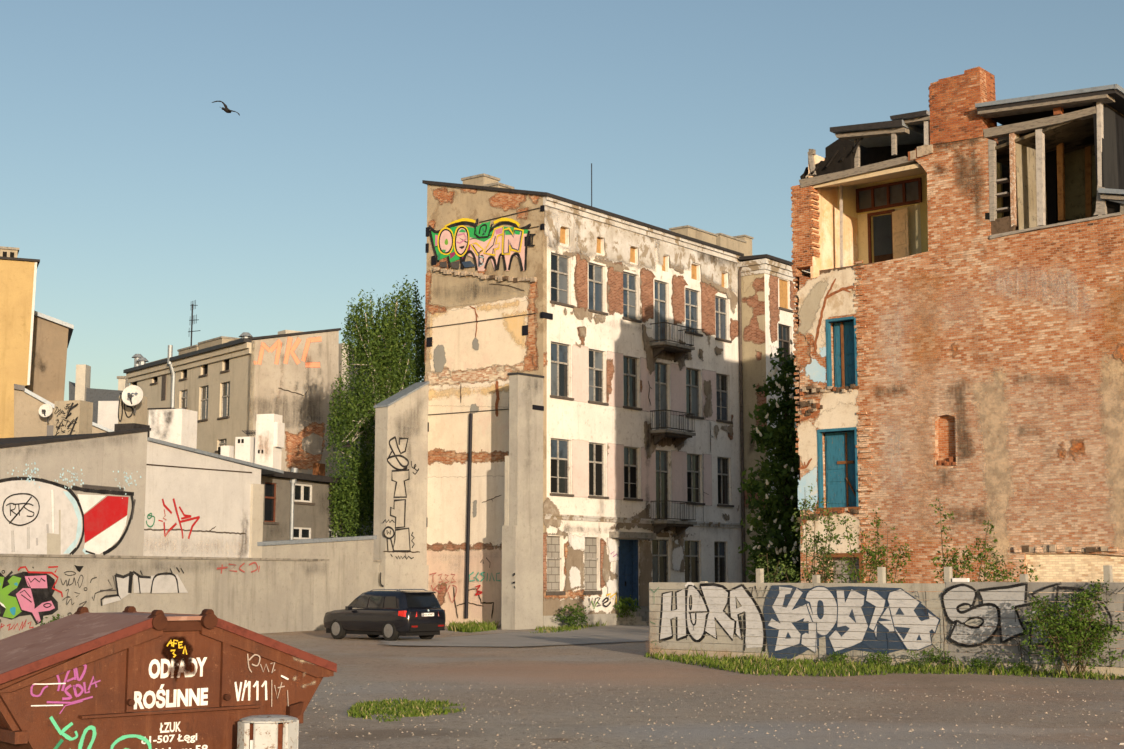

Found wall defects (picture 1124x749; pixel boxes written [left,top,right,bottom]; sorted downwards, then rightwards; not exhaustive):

flaking render [424,187,826,427]
flaking render [704,380,733,440]
peeling [814,402,859,429]
flaking render [285,422,325,470]
flaking render [428,448,508,465]
flaking render [427,541,502,552]
flaking render [543,497,695,618]